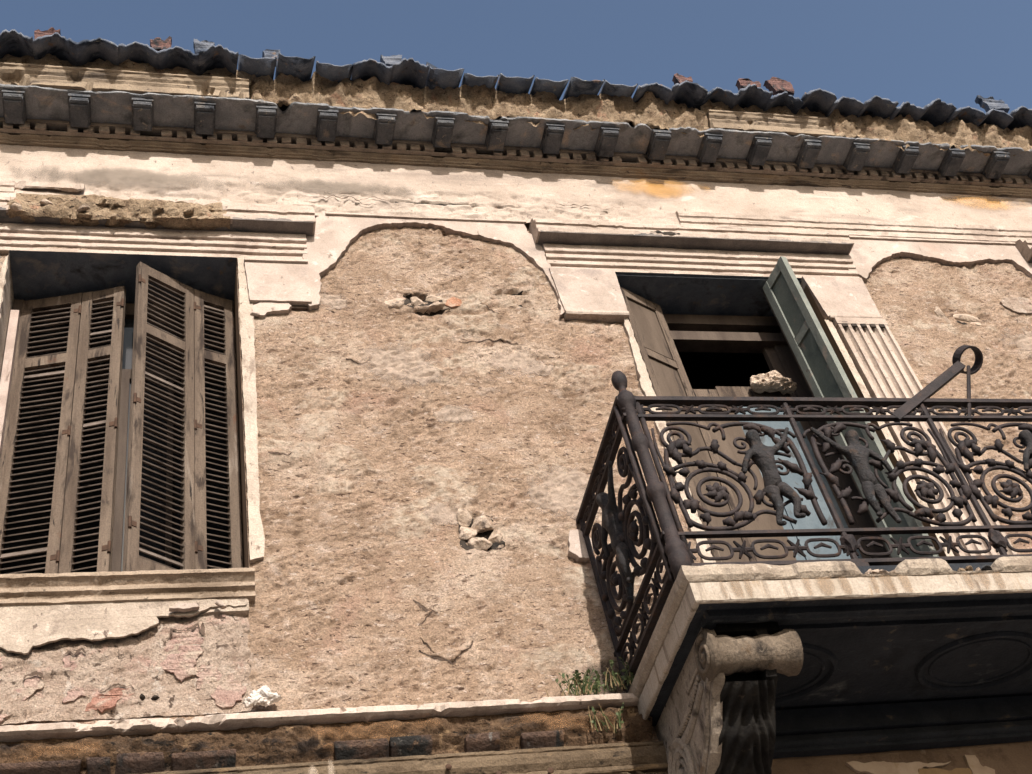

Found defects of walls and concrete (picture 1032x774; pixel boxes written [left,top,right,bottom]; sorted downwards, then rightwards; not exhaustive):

spalling [6,194,214,224]
hole [383,294,462,316]
spalling [934,306,981,326]
flaking render [1000,297,1032,315]
hole [457,508,505,551]
spalling [0,598,252,725]
spalling [0,706,653,774]
peeling [845,755,995,774]